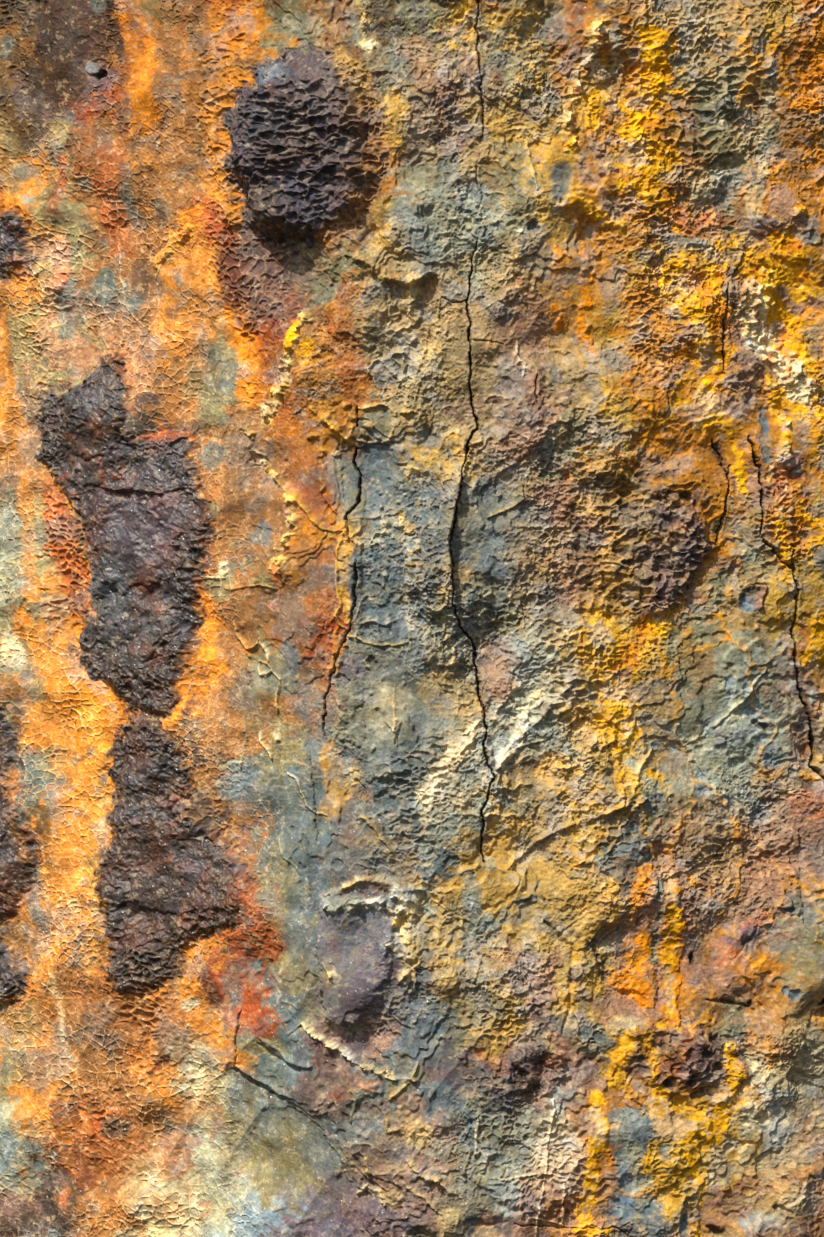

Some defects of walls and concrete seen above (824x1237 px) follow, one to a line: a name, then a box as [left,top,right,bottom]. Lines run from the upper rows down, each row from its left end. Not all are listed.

crack [474,0,487,210]
rust [583,23,680,176]
rust [537,231,613,362]
rust [658,250,750,496]
crack [297,406,364,842]
crack [441,240,505,865]
crack [711,435,824,779]
rust [225,860,288,1017]
rust [608,862,692,1030]
rust [45,1094,149,1193]
rust [573,1090,621,1237]
rust [643,1041,747,1209]